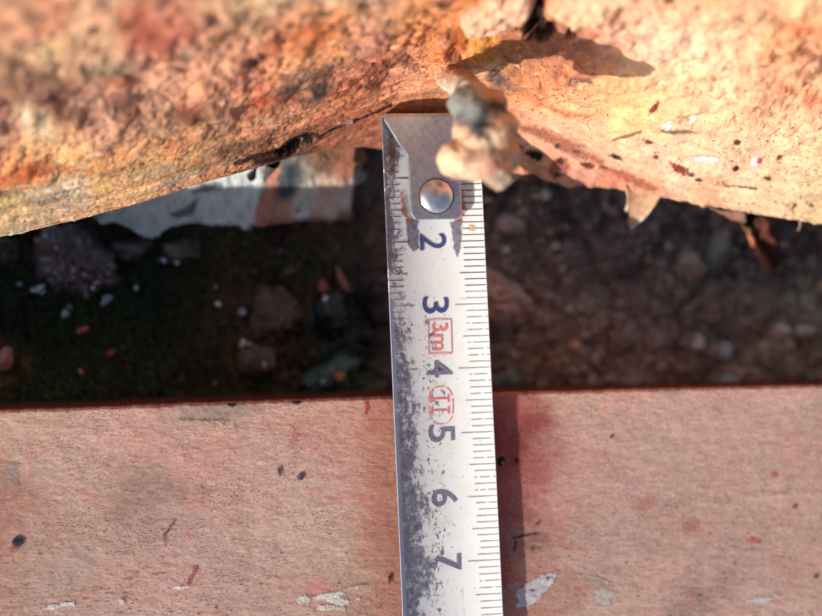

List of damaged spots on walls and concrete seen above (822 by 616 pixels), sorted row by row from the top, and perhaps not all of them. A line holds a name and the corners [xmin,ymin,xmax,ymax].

crack [233,103,392,166]
rust [400,192,412,223]
rust [740,212,784,271]